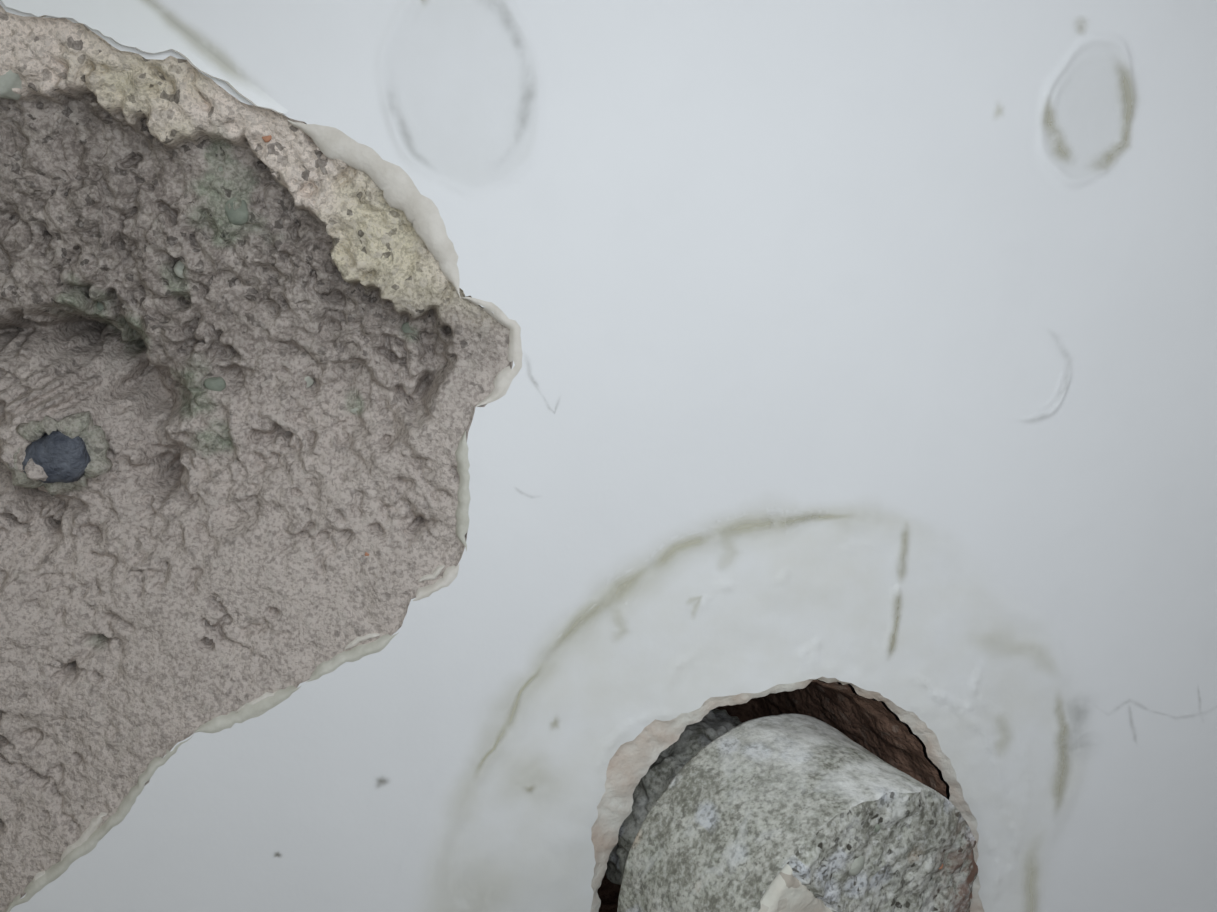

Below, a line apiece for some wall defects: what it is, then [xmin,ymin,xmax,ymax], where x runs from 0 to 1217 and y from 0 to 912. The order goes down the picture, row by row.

spalling [0,0,523,912]